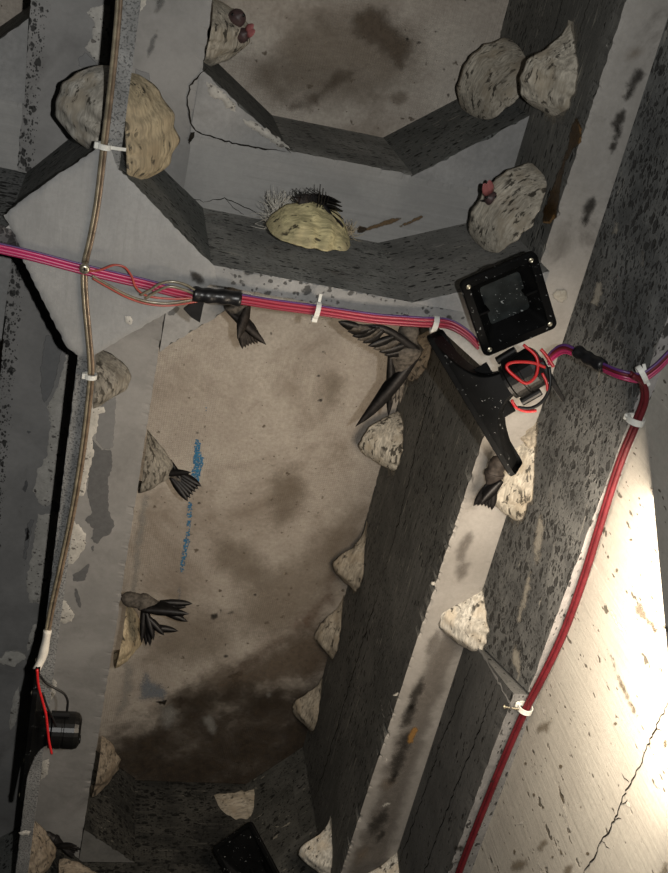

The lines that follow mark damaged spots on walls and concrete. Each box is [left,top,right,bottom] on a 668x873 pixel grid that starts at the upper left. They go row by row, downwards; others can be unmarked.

flaking render [78,5,111,67]
leakage [355,10,420,67]
spalling [206,82,236,112]
crack [187,68,285,152]
spalling [243,119,290,149]
corrosion [543,118,582,224]
flaking render [23,335,78,604]
spalling [60,398,116,624]
leakage [458,535,471,578]
leakage [114,617,328,784]
leakage [351,633,456,873]
crack [584,703,668,871]